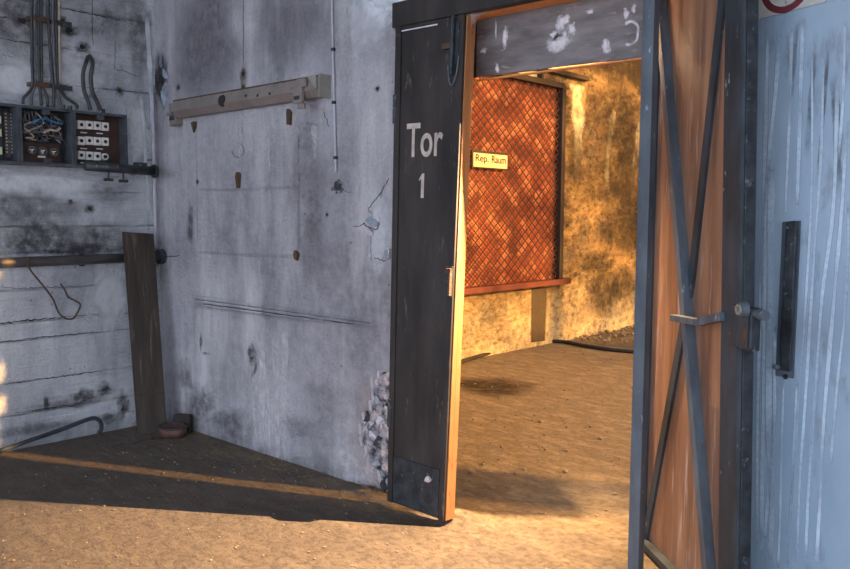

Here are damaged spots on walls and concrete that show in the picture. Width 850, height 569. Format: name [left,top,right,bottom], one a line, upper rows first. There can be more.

leakage [572,85,584,151]
crack [368,178,389,214]
leakage [592,268,630,311]
leakage [104,395,128,420]
flaking render [359,370,389,491]